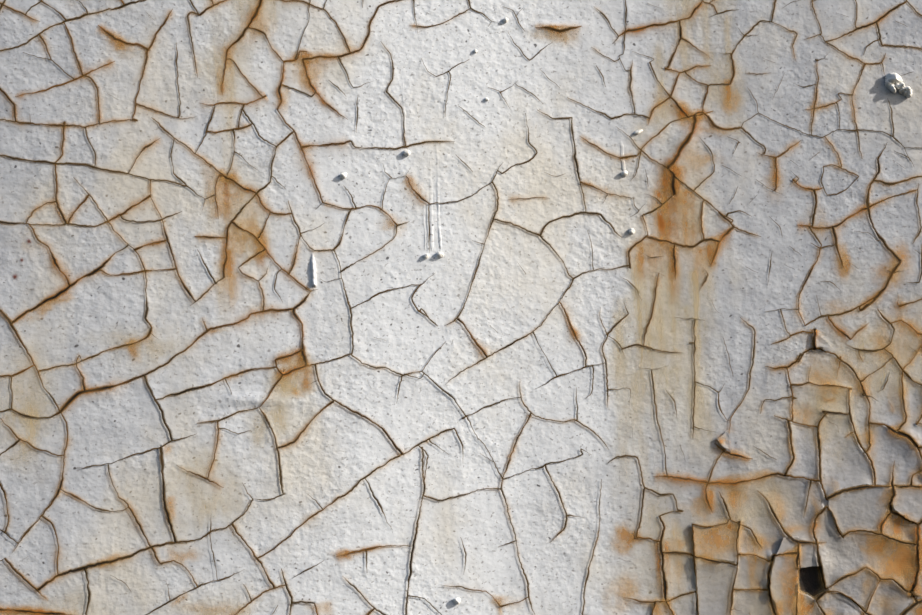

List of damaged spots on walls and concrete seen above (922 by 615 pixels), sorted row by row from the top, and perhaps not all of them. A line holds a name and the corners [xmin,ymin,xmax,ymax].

rust [655,160,694,281]
crack [0,0,608,615]
crack [402,0,922,615]
peeling [770,536,877,615]
peeling [828,487,922,615]
rust [872,515,922,580]